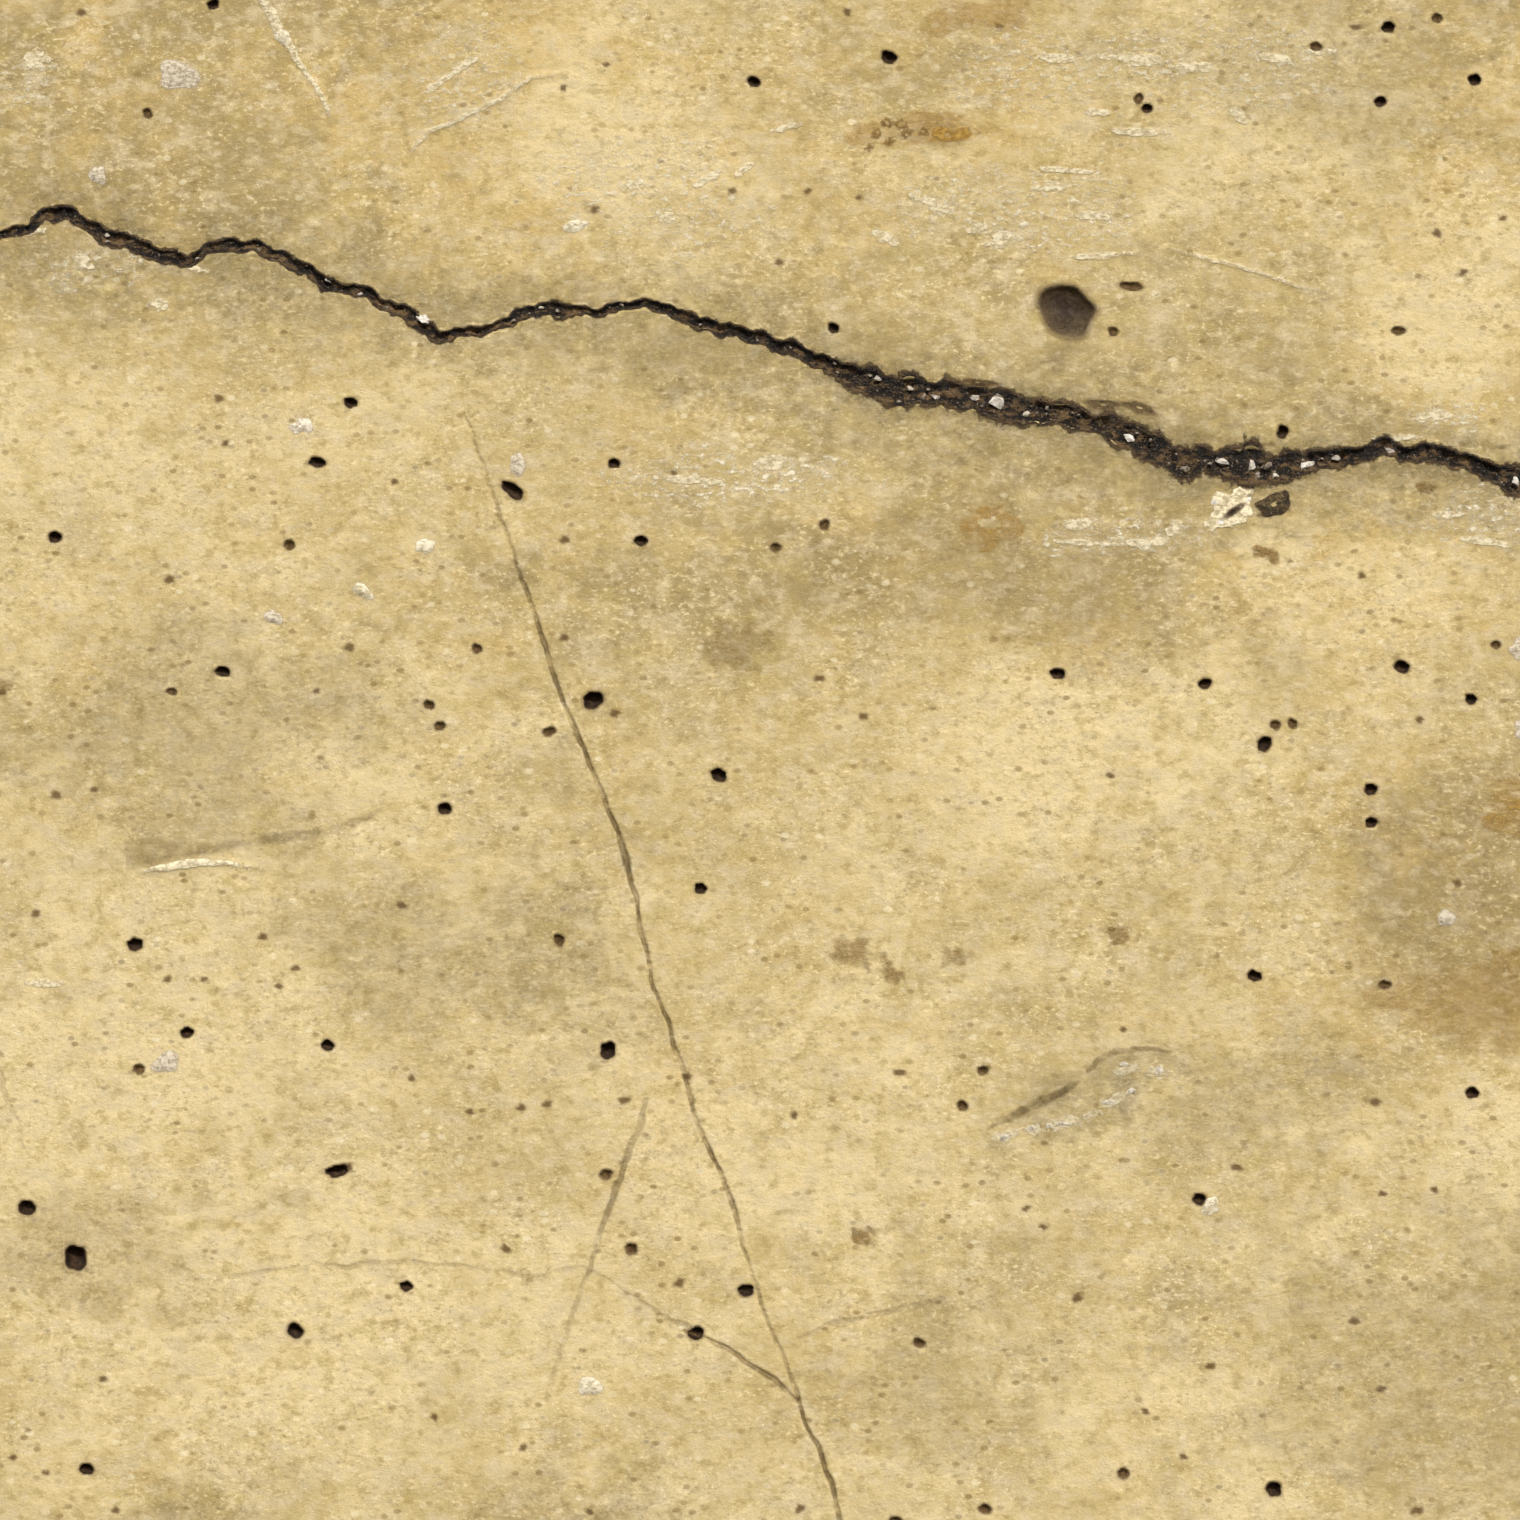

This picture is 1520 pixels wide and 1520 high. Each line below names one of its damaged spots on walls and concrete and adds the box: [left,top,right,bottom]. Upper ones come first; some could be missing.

crack [0,204,1520,517]
crack [521,577,737,1220]
crack [728,1350,840,1517]